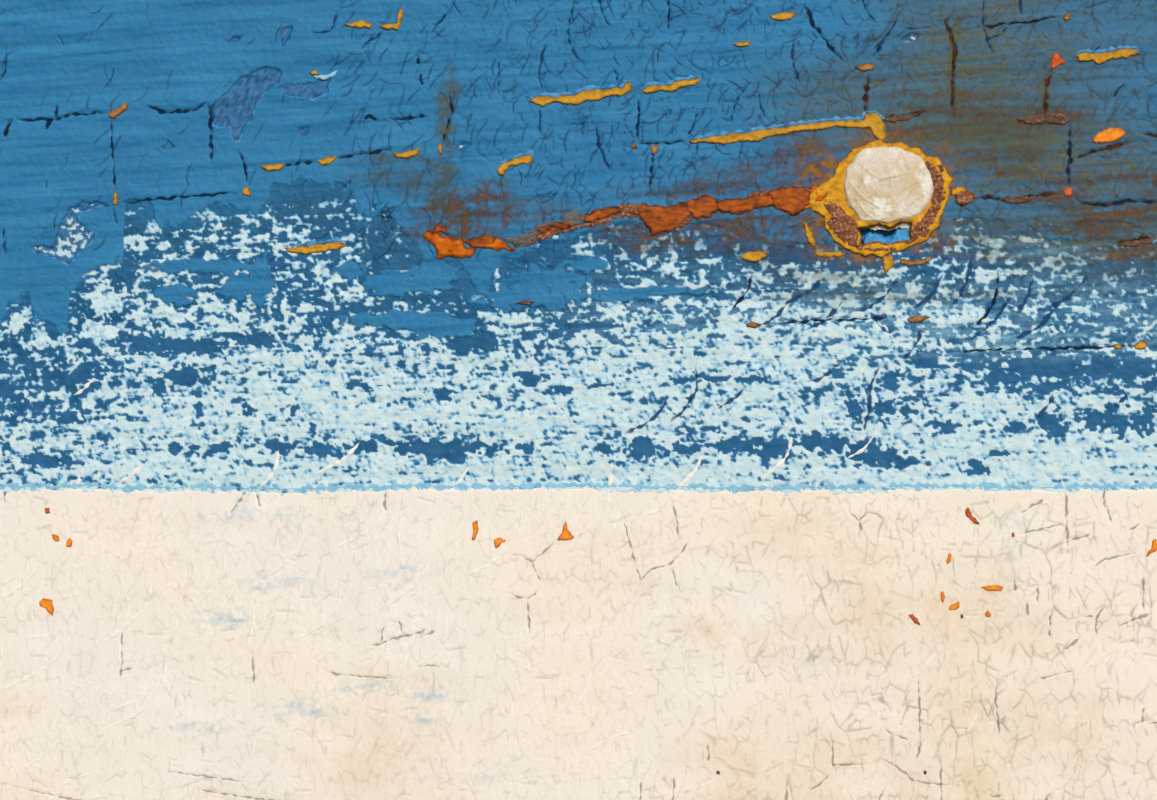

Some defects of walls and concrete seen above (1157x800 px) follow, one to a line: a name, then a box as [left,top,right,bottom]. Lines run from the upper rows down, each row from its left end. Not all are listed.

peeling [208,66,337,143]
peeling [343,8,404,30]
peeling [530,75,701,107]
peeling [770,12,798,20]
crack [791,8,842,79]
crack [862,0,958,108]
peeling [1051,45,1140,70]
crack [4,104,247,223]
rust [423,137,839,260]
crack [636,102,698,185]
crack [981,132,1157,207]
peeling [0,110,1157,496]